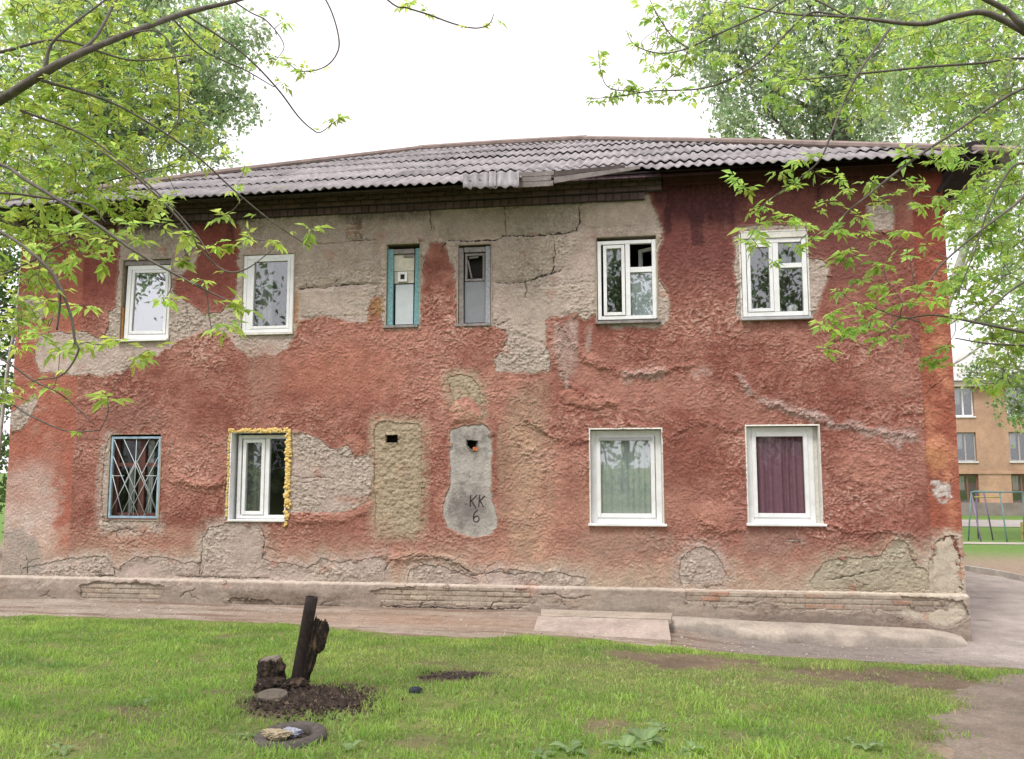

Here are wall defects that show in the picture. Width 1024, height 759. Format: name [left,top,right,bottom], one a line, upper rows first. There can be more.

flaking render [34,193,671,378]
crack [422,207,581,295]
damp [655,167,760,244]
flaking render [21,429,586,609]
flaking render [684,535,969,628]